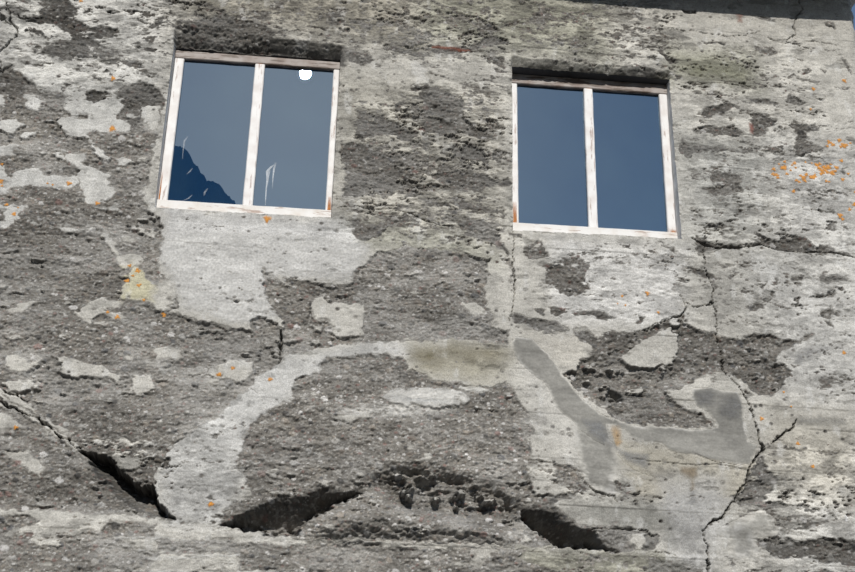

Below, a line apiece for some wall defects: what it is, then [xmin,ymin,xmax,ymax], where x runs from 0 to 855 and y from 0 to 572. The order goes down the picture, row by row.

crack [0,0,42,78]
spalling [23,0,120,58]
crack [650,1,839,49]
spalling [686,171,744,196]
spalling [695,224,850,257]
spalling [0,64,690,572]
crack [508,238,516,321]
spalling [790,273,848,329]
spalling [509,307,813,429]
crack [0,390,82,451]
crack [631,236,855,572]
spalling [731,454,794,509]